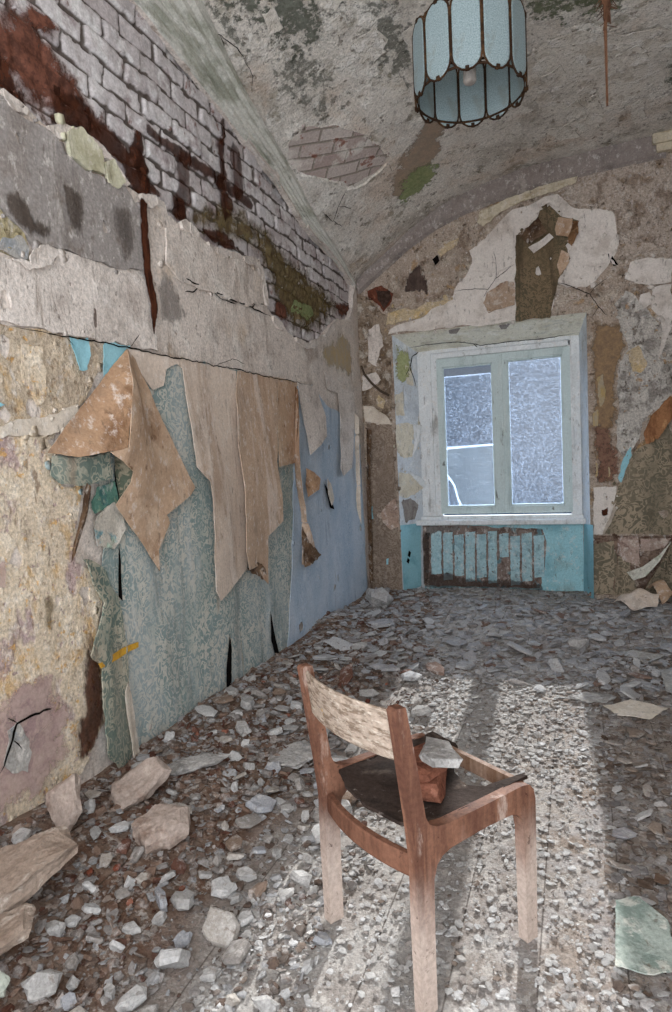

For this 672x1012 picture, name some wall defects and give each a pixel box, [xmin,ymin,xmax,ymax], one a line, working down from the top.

rust [0,0,253,334]
water stain [171,195,187,221]
water stain [202,228,239,251]
water stain [275,300,313,320]
flaking render [0,0,672,598]
water stain [335,303,349,317]
rust [422,525,547,591]
peeling [0,426,106,826]
peeling [359,676,379,697]
peeling [194,705,218,717]
crack [0,708,51,773]
peeling [235,813,261,828]